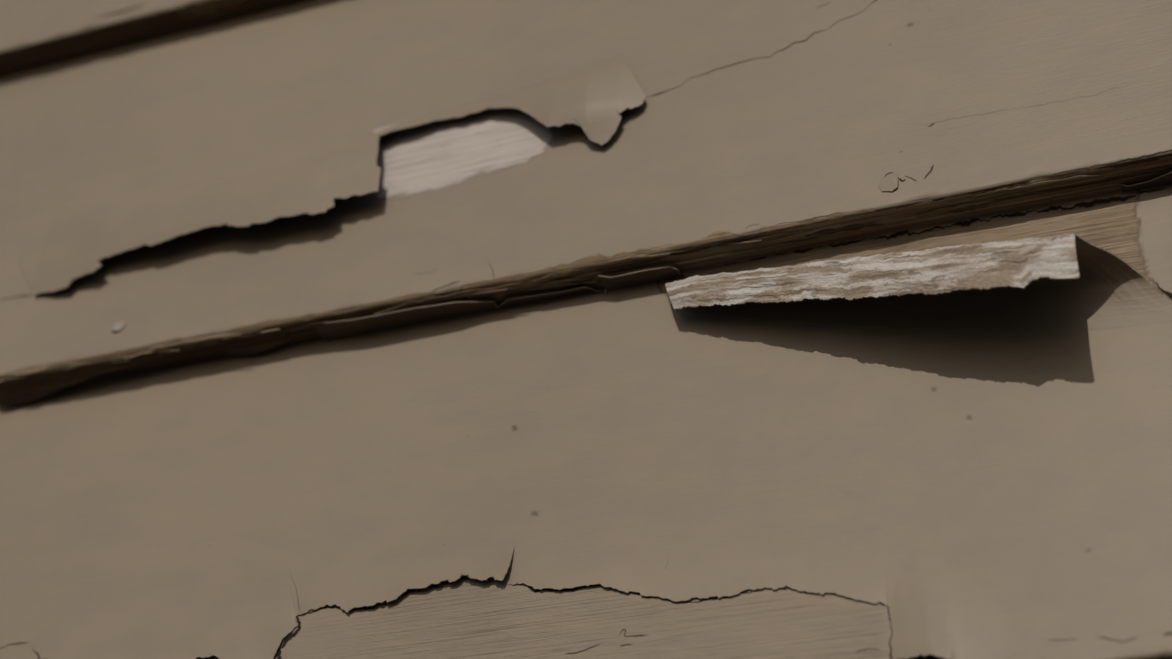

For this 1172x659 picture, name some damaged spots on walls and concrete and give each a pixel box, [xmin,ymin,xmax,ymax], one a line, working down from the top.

crack [649,0,876,97]
peeling [17,54,646,296]
peeling [315,171,1172,341]
peeling [34,545,1026,659]